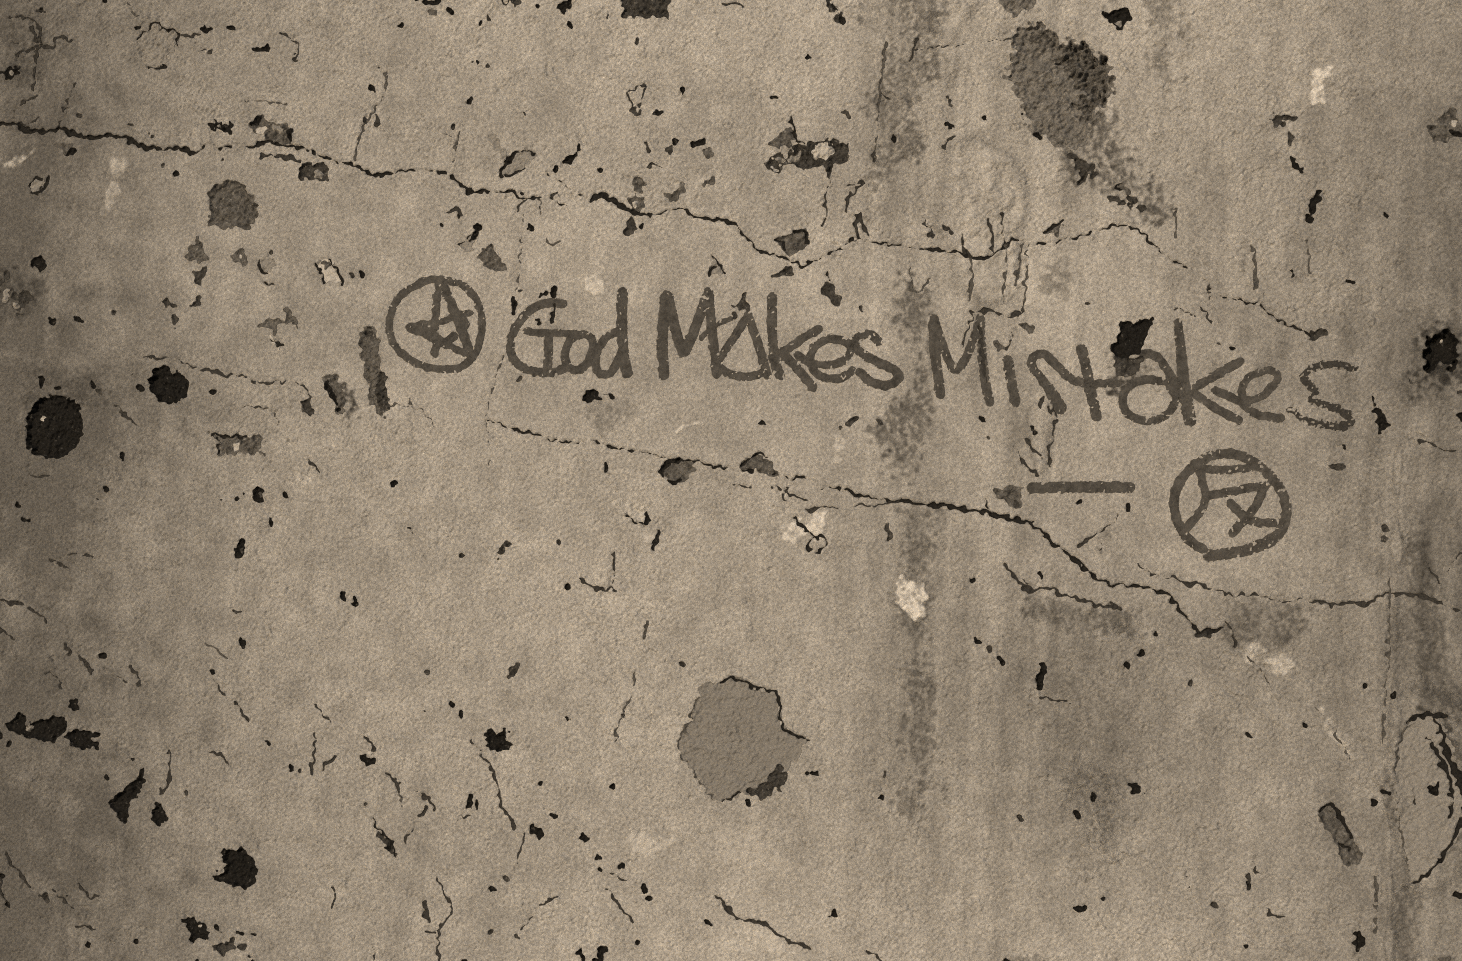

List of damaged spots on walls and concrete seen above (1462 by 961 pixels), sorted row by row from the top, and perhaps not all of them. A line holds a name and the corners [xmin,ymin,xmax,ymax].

spalling [606,0,671,19]
spalling [999,0,1116,185]
spalling [764,116,849,178]
crack [0,10,1311,383]
spalling [161,180,259,329]
spalling [25,376,84,459]
spalling [131,361,189,405]
spalling [1110,317,1154,377]
crack [485,355,1462,759]
spalling [677,675,819,807]
spalling [212,846,258,890]
crack [1372,876,1380,934]